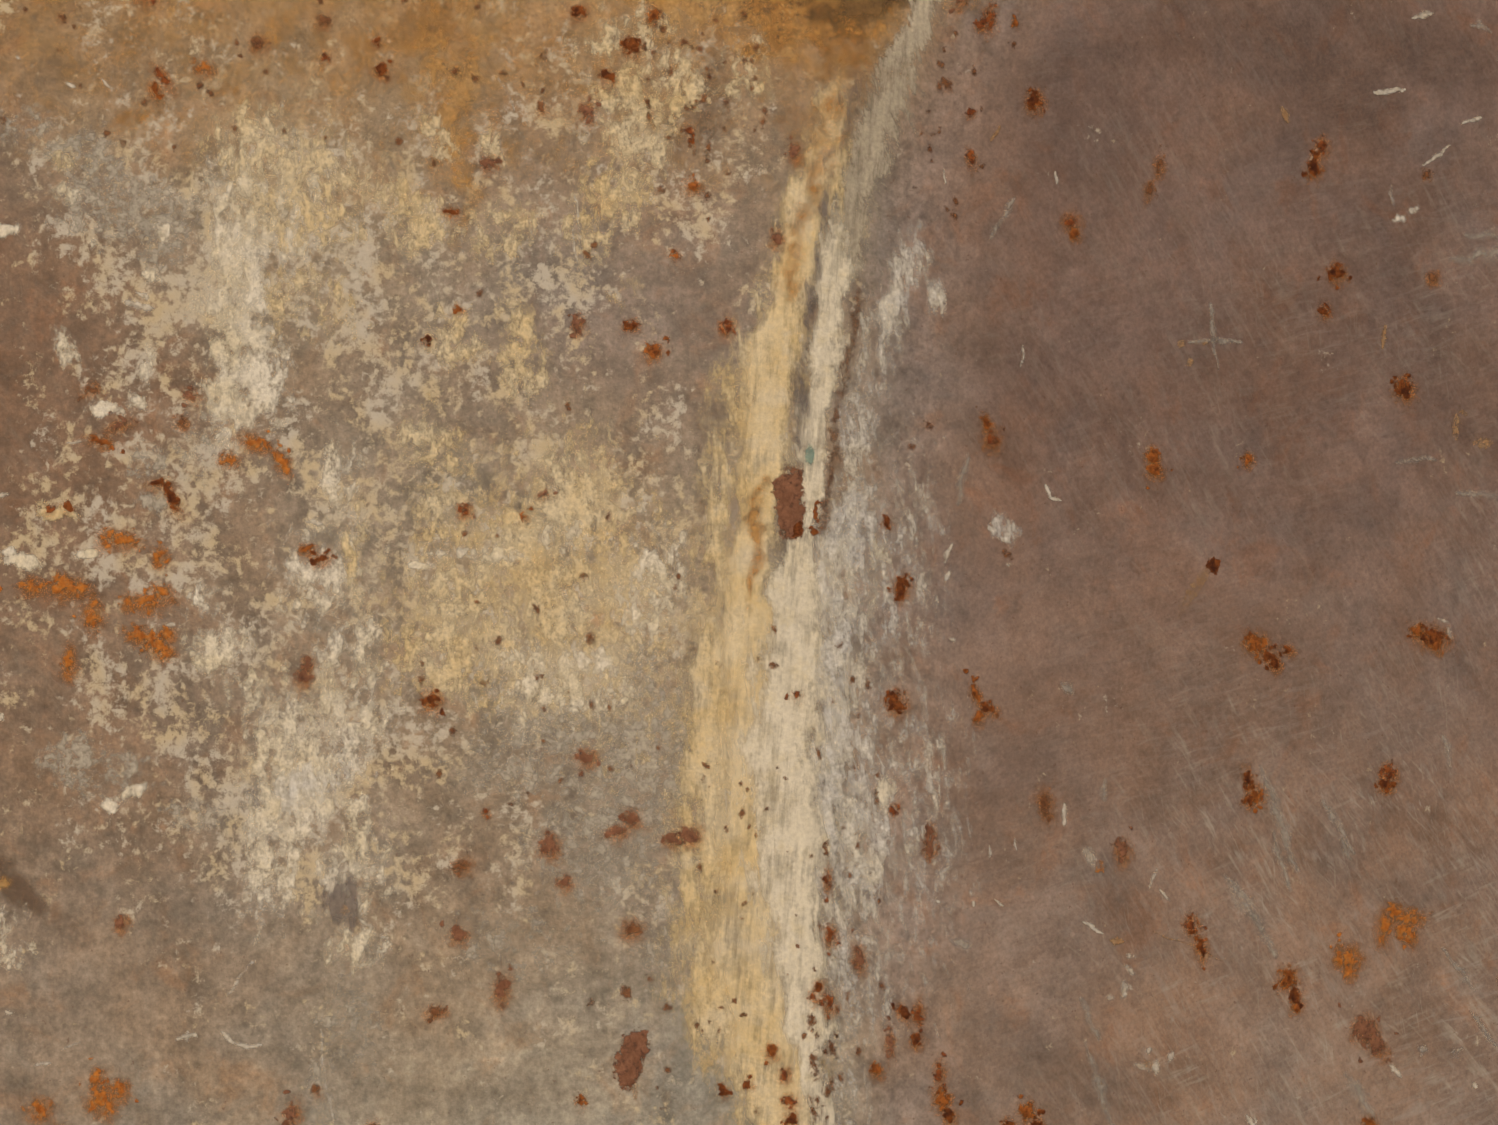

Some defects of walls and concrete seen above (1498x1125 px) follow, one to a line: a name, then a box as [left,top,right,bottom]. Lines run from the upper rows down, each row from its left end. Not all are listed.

corrosion [619,35,642,56]
corrosion [627,0,906,63]
peeling [562,0,771,264]
peeling [127,99,549,512]
peeling [90,348,154,418]
peeling [2,546,41,572]
corrosion [99,528,176,661]
peeling [180,330,752,1125]
peeling [35,731,150,814]
corrosion [613,1030,650,1099]
corrosion [869,1001,924,1080]
corrosion [929,1052,963,1125]